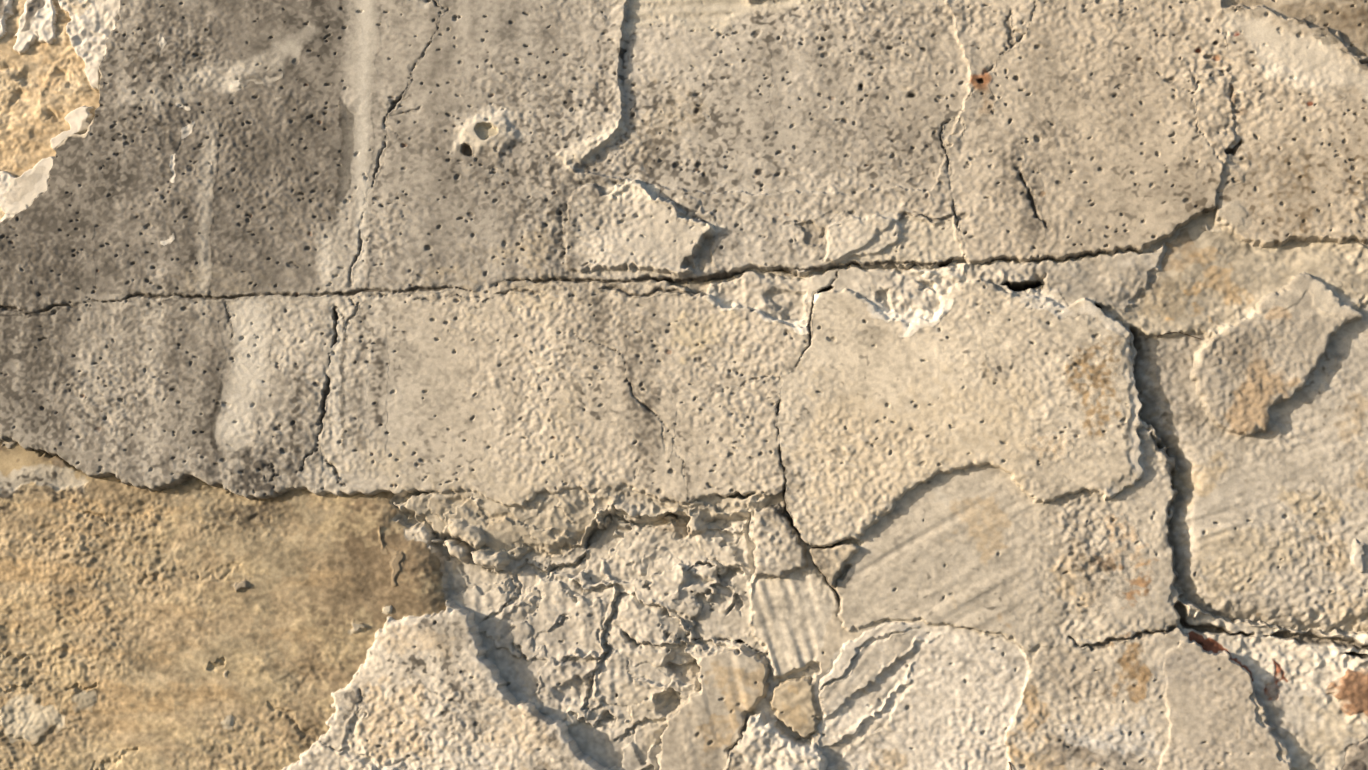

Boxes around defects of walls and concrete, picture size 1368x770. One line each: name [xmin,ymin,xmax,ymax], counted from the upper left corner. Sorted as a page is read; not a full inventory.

leakage [0,187,96,438]
peeling [0,0,120,223]
leakage [148,0,389,499]
crack [0,0,1142,611]
peeling [555,119,628,180]
peeling [617,0,829,40]
corrosion [968,68,996,116]
spalling [0,442,91,498]
crack [661,604,771,661]
crack [1066,426,1368,652]